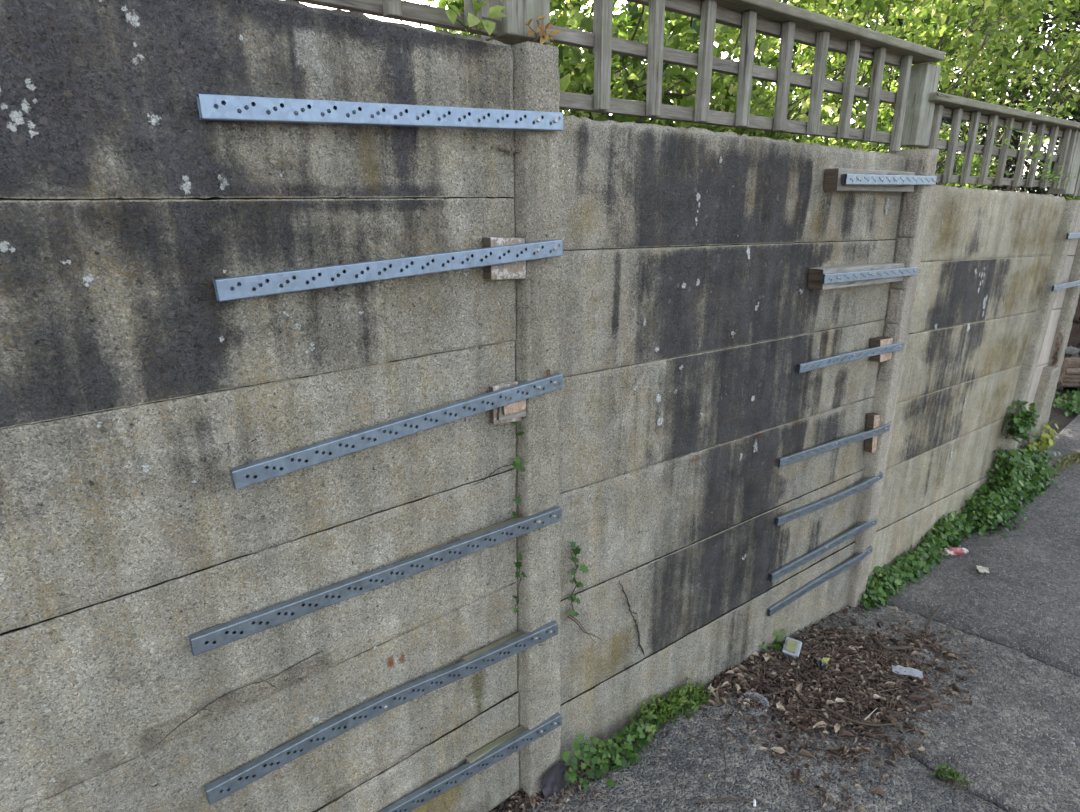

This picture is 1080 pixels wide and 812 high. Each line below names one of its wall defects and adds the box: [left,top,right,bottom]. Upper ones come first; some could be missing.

damp [578,125,589,189]
damp [0,0,506,428]
damp [607,128,855,668]
damp [904,224,1025,488]
damp [183,417,220,489]
crack [619,580,645,657]
crack [155,651,323,746]